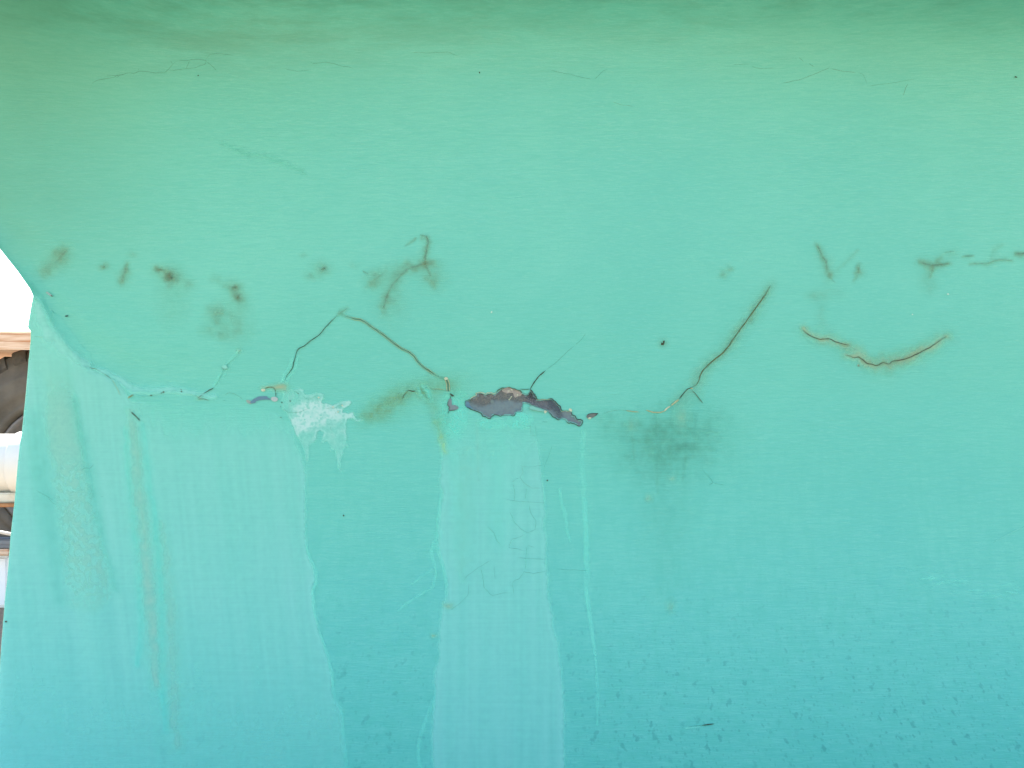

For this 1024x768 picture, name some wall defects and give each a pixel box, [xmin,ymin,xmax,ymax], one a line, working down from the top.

crack [268,315,450,397]
peeling [447,387,598,426]
crack [626,287,770,413]
crack [802,327,947,369]
leakage [2,301,331,745]
leakage [432,448,564,768]